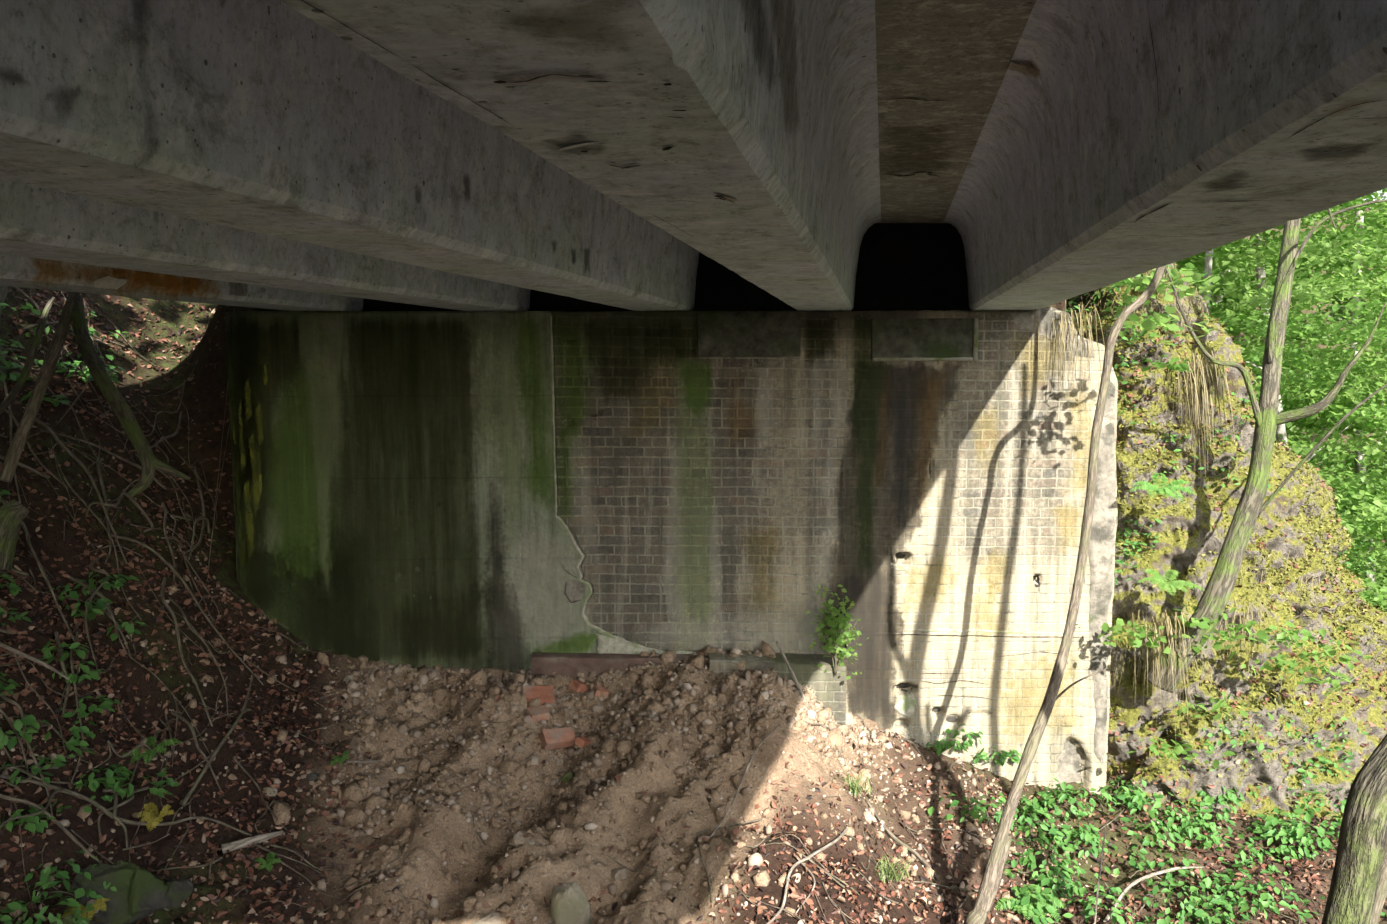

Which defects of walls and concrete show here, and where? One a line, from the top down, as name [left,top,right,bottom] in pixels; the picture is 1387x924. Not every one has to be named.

corrosion [34,259,219,300]
damp [284,315,342,587]
damp [467,317,599,673]
damp [639,354,961,730]